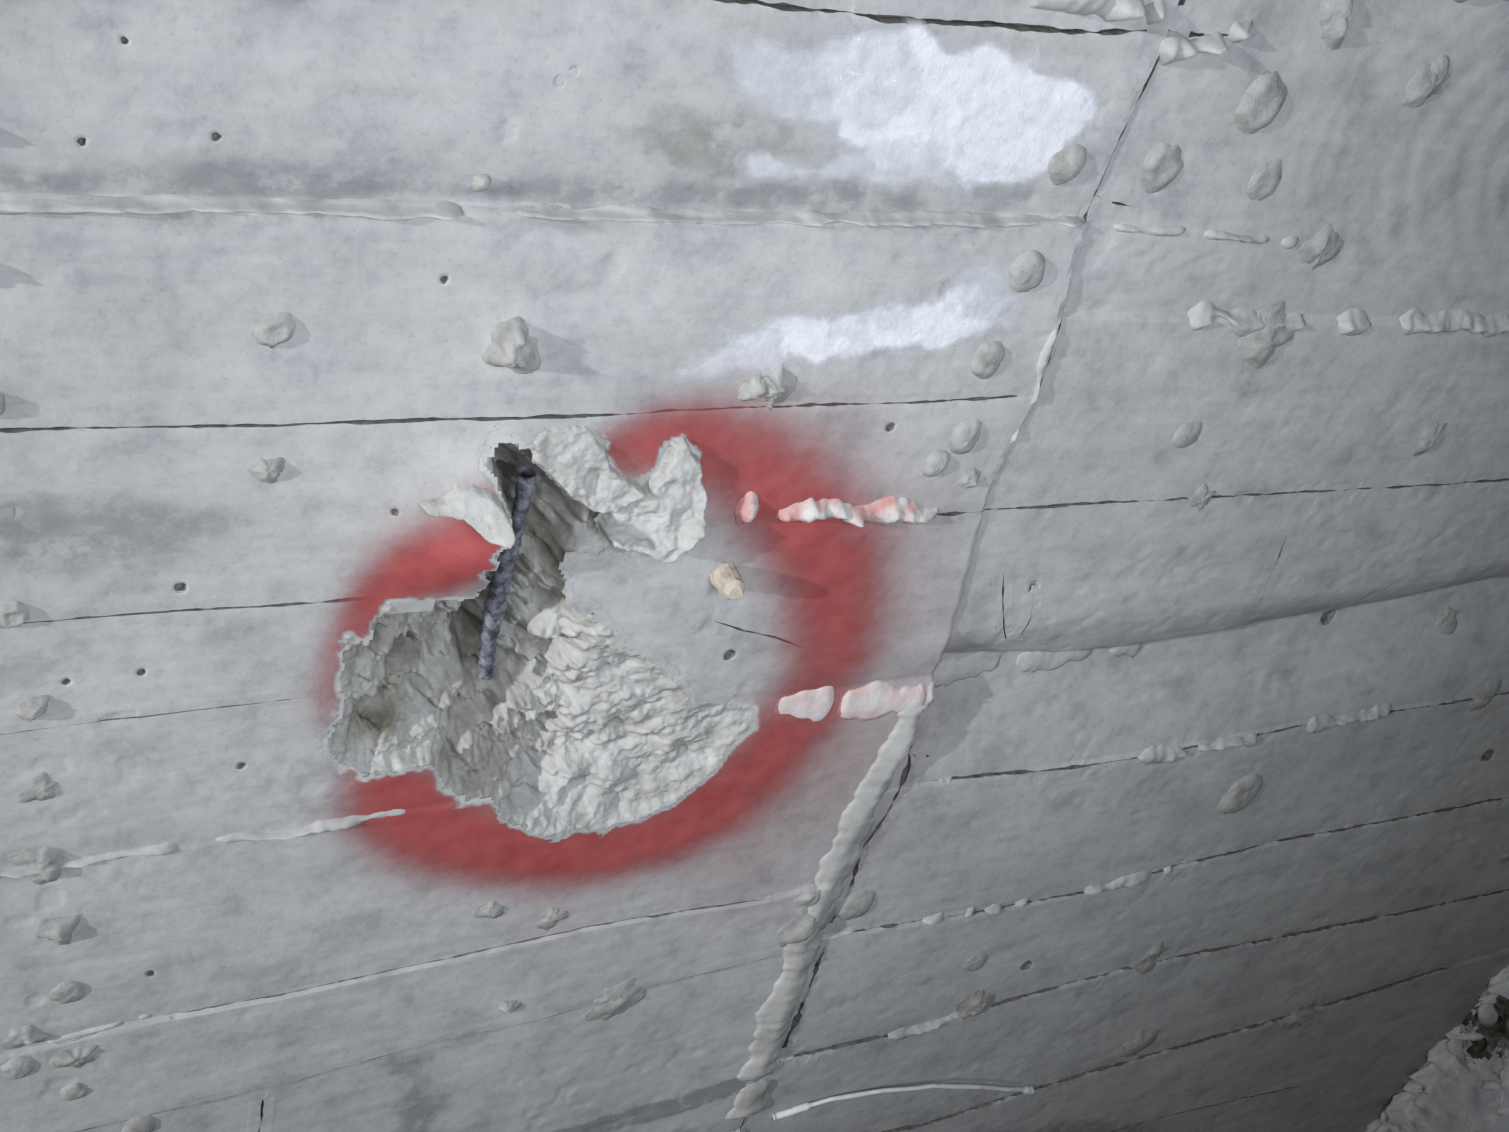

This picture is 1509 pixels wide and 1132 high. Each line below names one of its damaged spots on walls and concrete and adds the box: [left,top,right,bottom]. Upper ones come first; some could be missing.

leakage [736,24,1098,198]
crack [0,0,1509,651]
spalling [313,417,762,844]
crack [698,607,799,659]